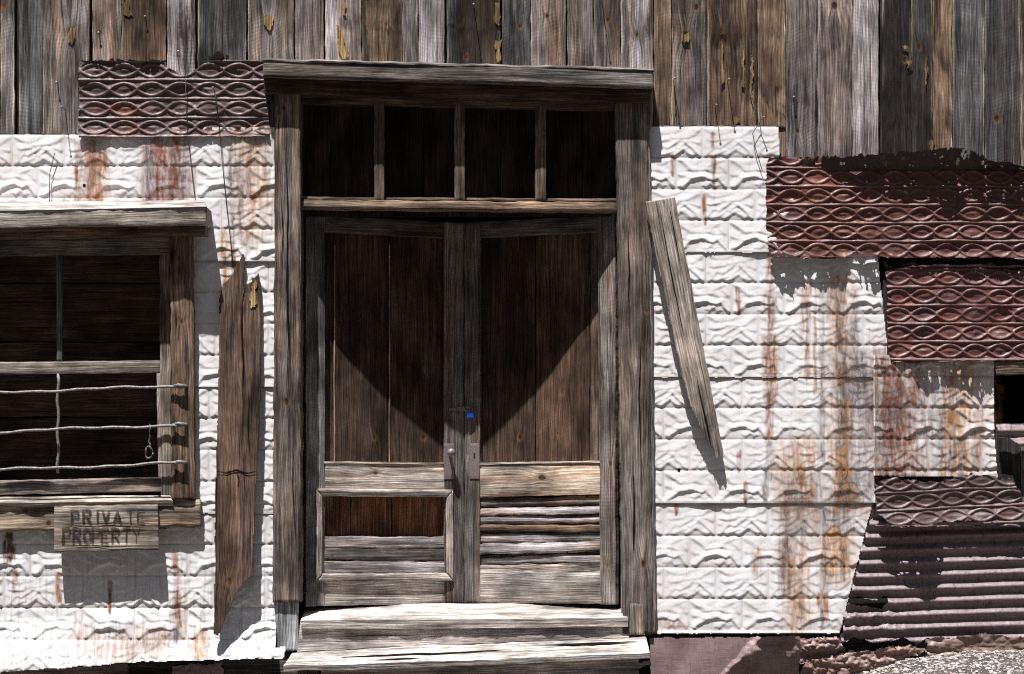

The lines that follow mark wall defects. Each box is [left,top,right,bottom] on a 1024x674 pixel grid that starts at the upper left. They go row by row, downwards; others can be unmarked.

rust [75,139,107,201]
rust [146,137,185,201]
rust [236,140,264,237]
rust [221,232,236,284]
rust [764,299,776,440]
rust [782,351,977,624]